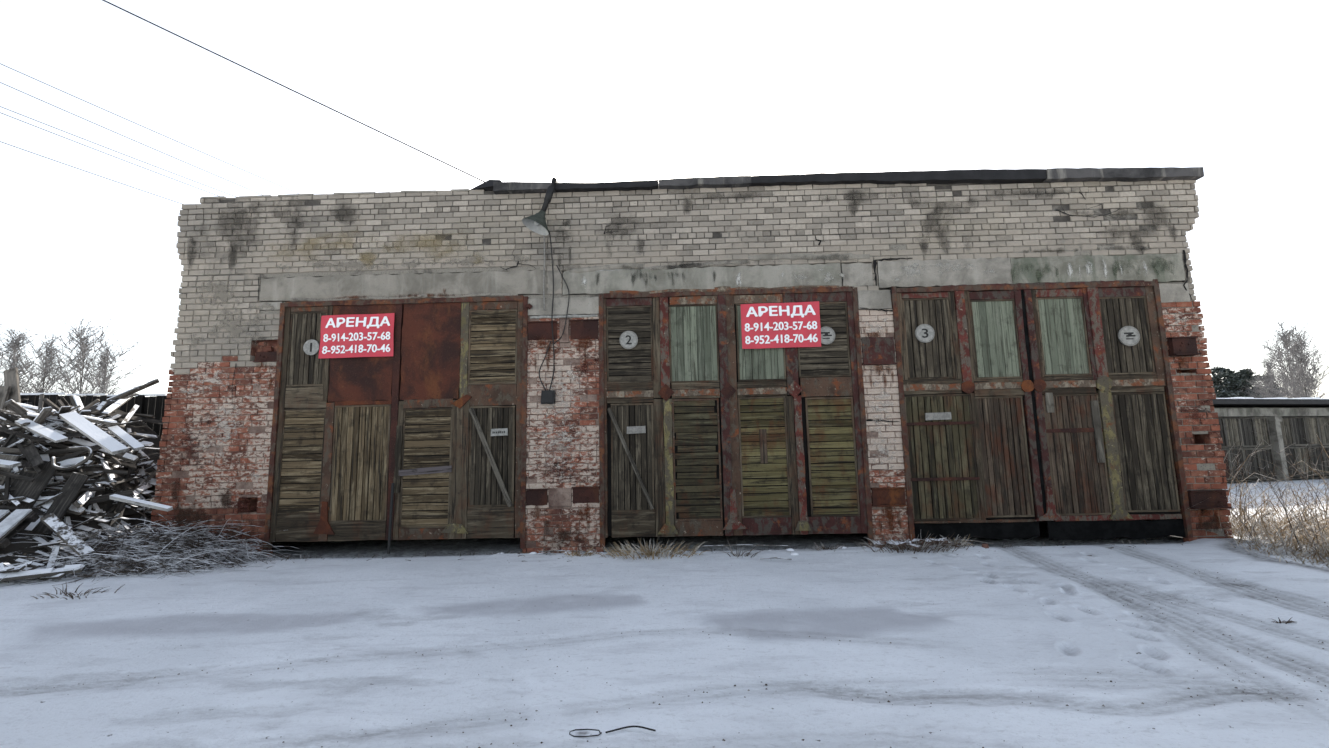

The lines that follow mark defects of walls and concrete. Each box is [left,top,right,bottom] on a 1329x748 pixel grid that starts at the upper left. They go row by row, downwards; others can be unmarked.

water stain [848,191,865,213]
water stain [292,205,373,263]
crack [1183,250,1192,299]
spalling [175,382,259,468]
peeling [529,355,598,485]
spalling [1182,400,1216,444]
spalling [227,494,258,513]